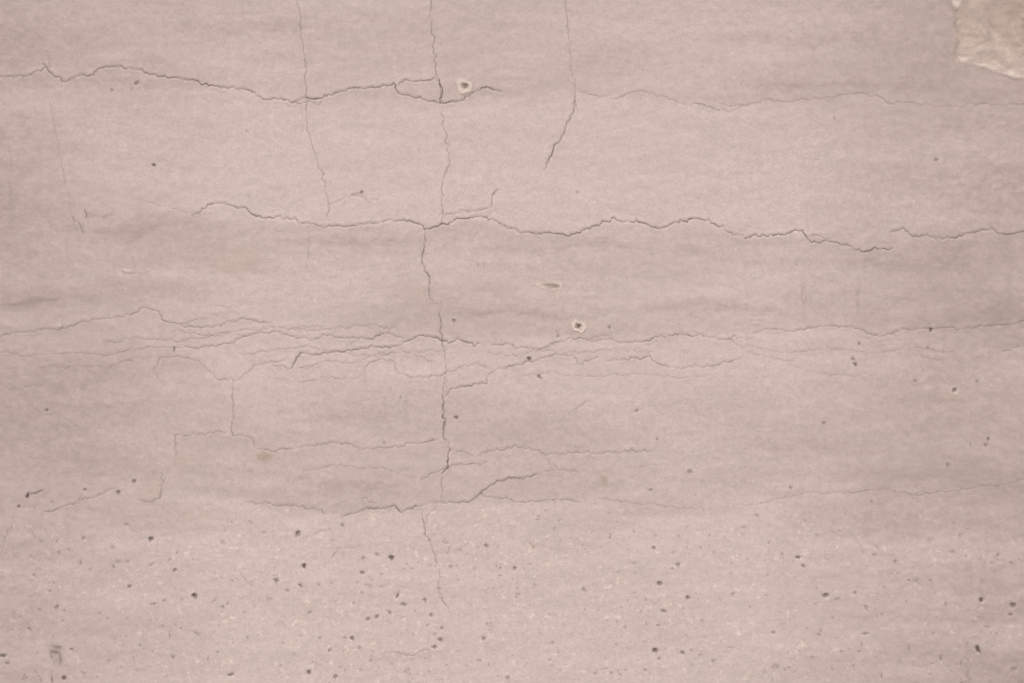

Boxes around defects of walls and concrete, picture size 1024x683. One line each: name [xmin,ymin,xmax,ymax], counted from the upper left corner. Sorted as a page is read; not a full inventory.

peeling [952,0,1024,78]